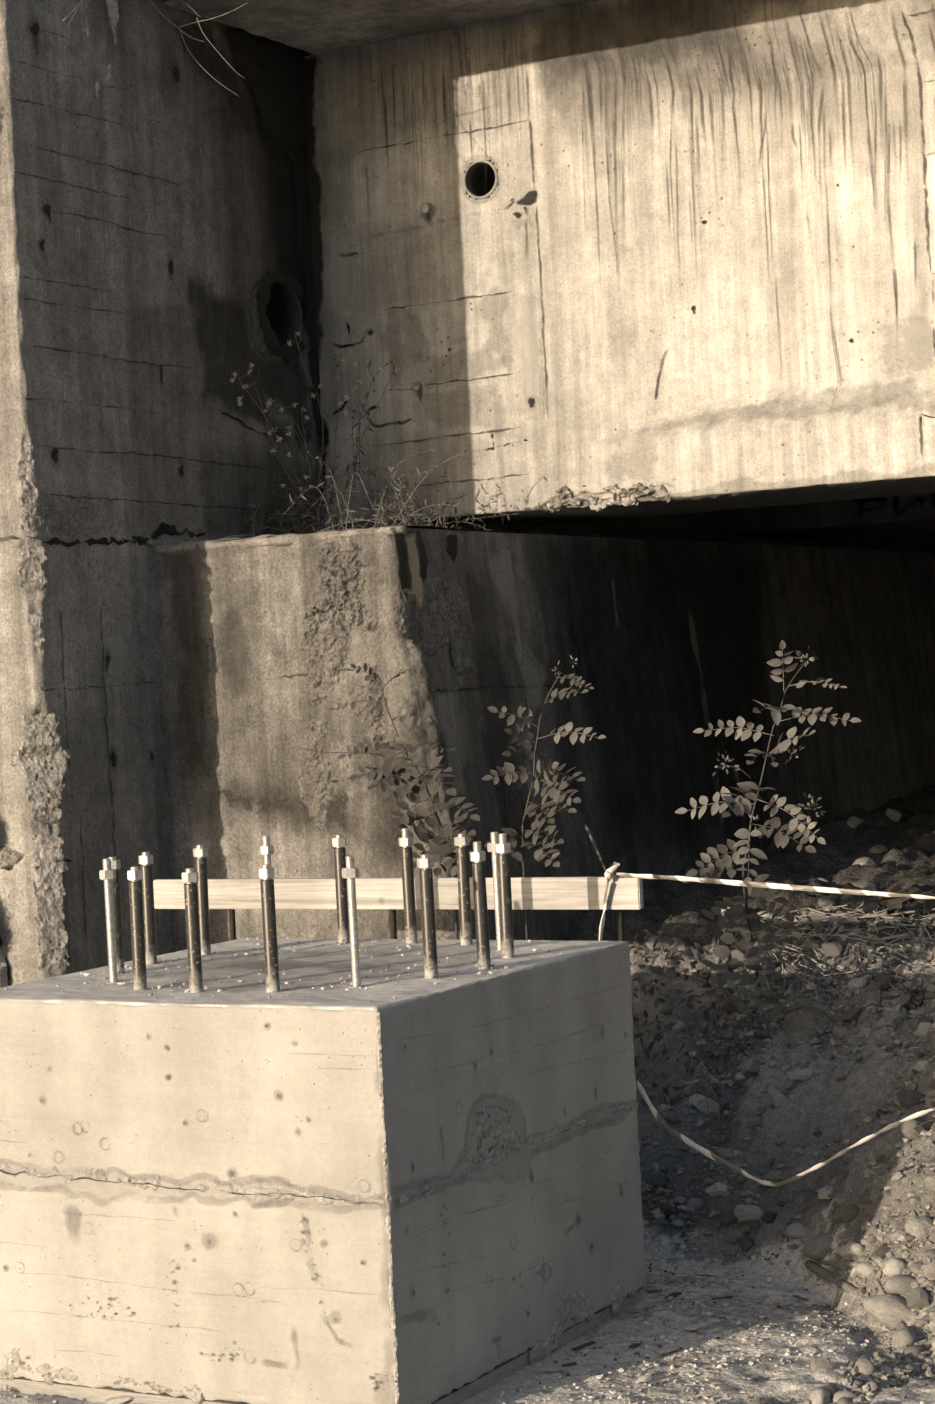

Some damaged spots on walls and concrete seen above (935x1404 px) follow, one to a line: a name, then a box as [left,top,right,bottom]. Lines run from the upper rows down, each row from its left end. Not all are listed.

leakage [106,0,119,44]
spalling [6,439,205,593]
spalling [28,612,45,652]
spalling [0,712,71,973]
crack [0,1107,631,1206]